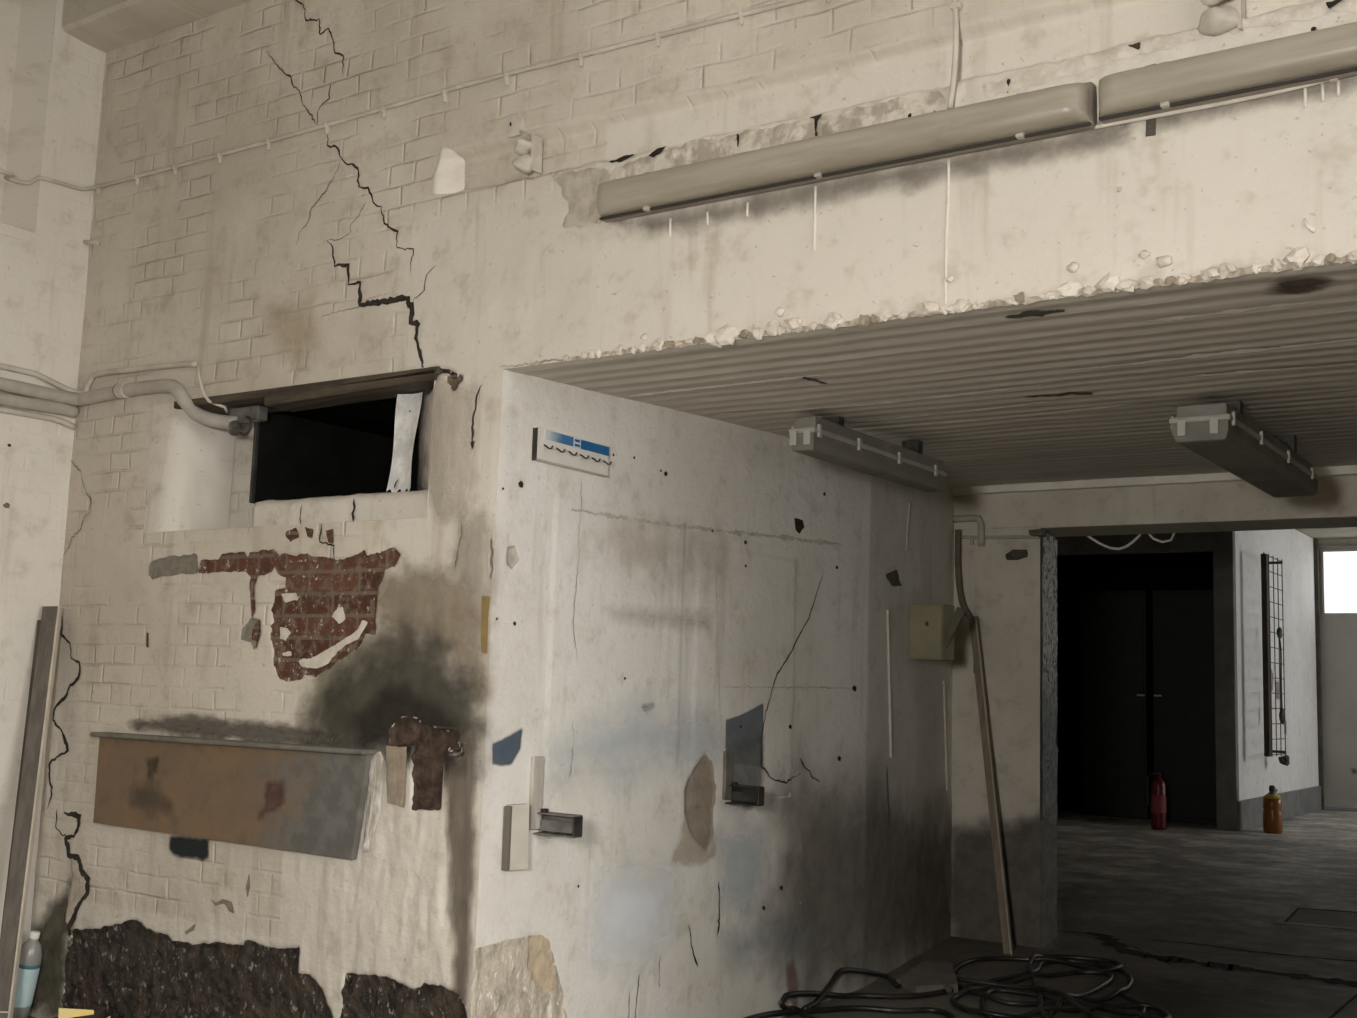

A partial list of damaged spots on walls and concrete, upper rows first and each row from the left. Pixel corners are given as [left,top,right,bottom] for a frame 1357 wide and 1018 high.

crack [267,0,436,368]
spalling [552,91,948,228]
peeling [148,527,400,682]
crack [47,618,90,939]
spalling [363,716,461,853]
spalling [61,859,567,1018]
crack [1060,931,1357,987]